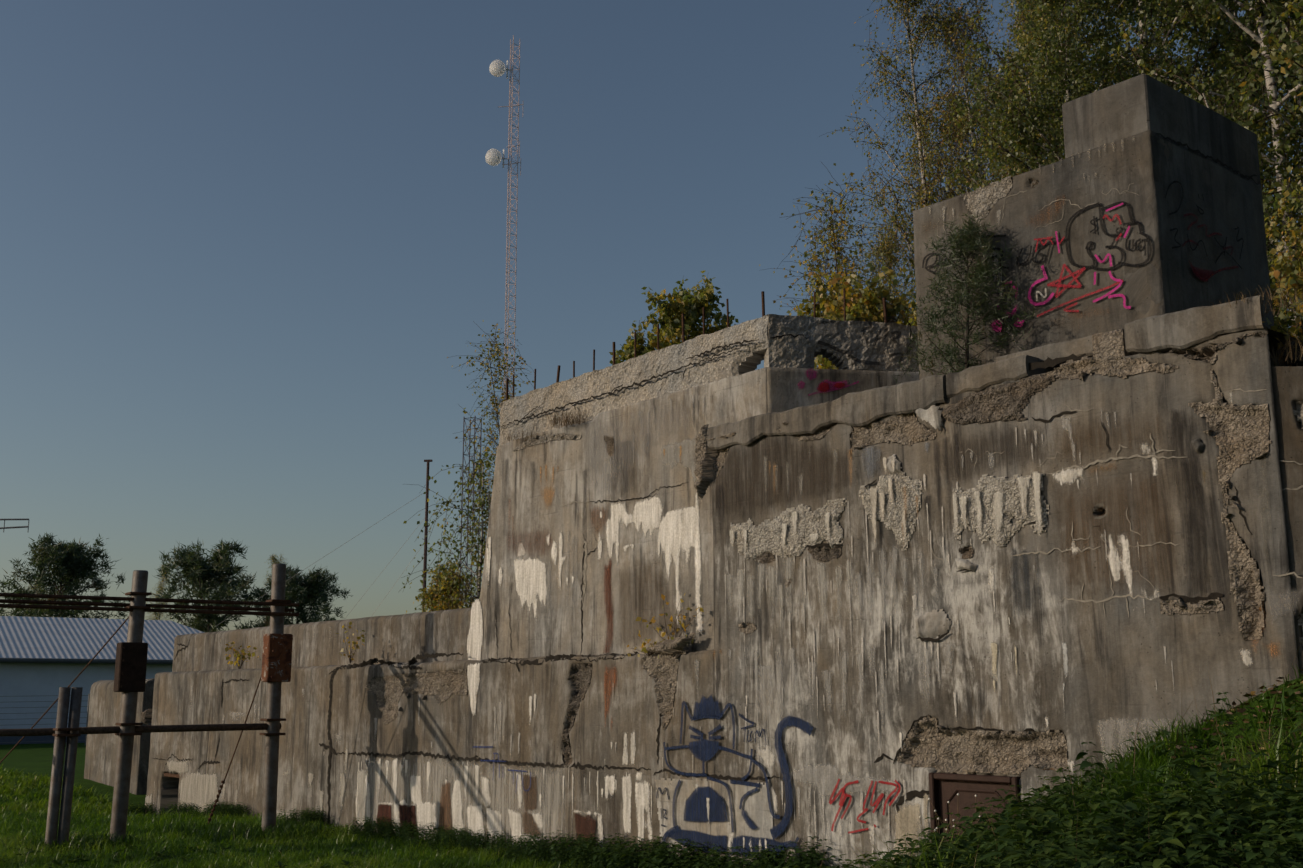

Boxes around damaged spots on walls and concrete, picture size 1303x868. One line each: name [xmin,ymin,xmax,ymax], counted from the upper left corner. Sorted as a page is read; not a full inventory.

spalling [850,331,1271,640]
crack [1234,486,1252,534]
crack [1280,460,1303,490]
spalling [755,552,776,563]
spalling [807,546,841,562]
damp [598,418,1098,768]
crack [1273,572,1303,618]
crack [319,482,779,823]
spalling [897,715,1068,775]
damp [772,764,928,863]